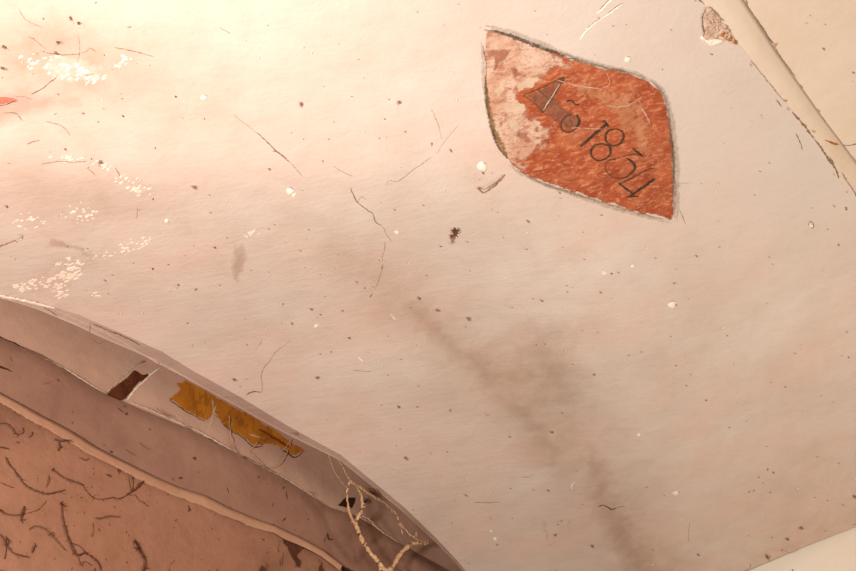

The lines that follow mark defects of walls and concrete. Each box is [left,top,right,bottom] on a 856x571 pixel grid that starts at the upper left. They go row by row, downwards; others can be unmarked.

crack [580,0,622,40]
flaking render [700,7,738,46]
crack [746,0,856,195]
peeling [0,237,315,498]